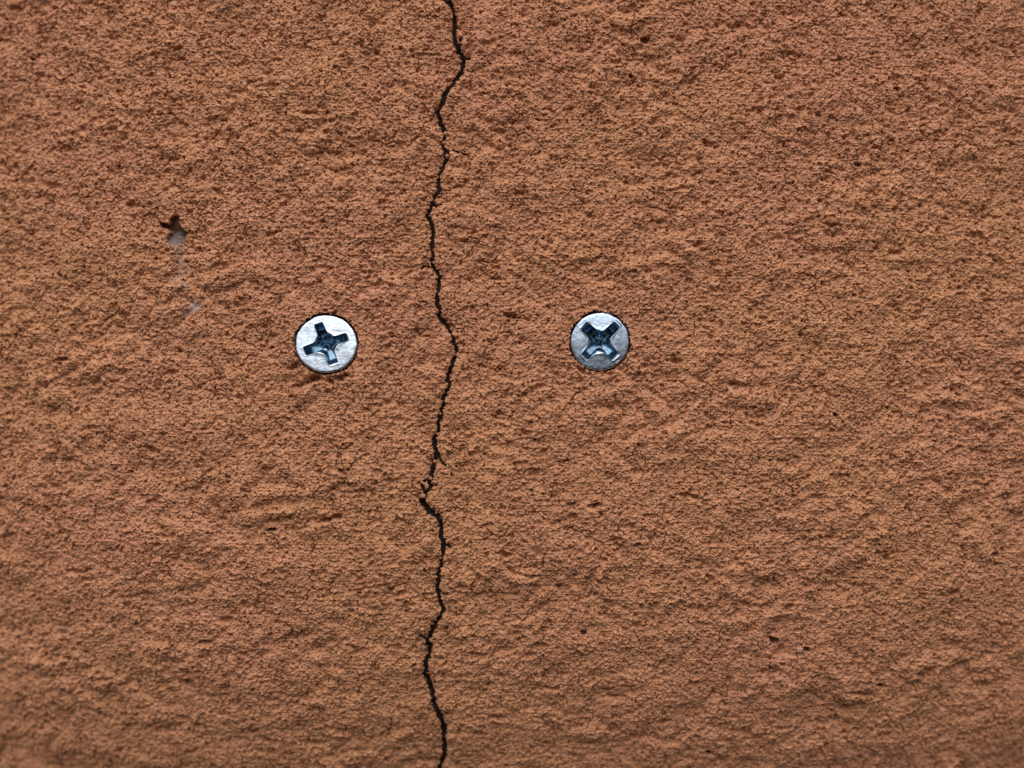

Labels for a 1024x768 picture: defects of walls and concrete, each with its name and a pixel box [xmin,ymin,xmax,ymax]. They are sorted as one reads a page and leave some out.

spalling [162,216,188,246]
crack [418,0,468,768]